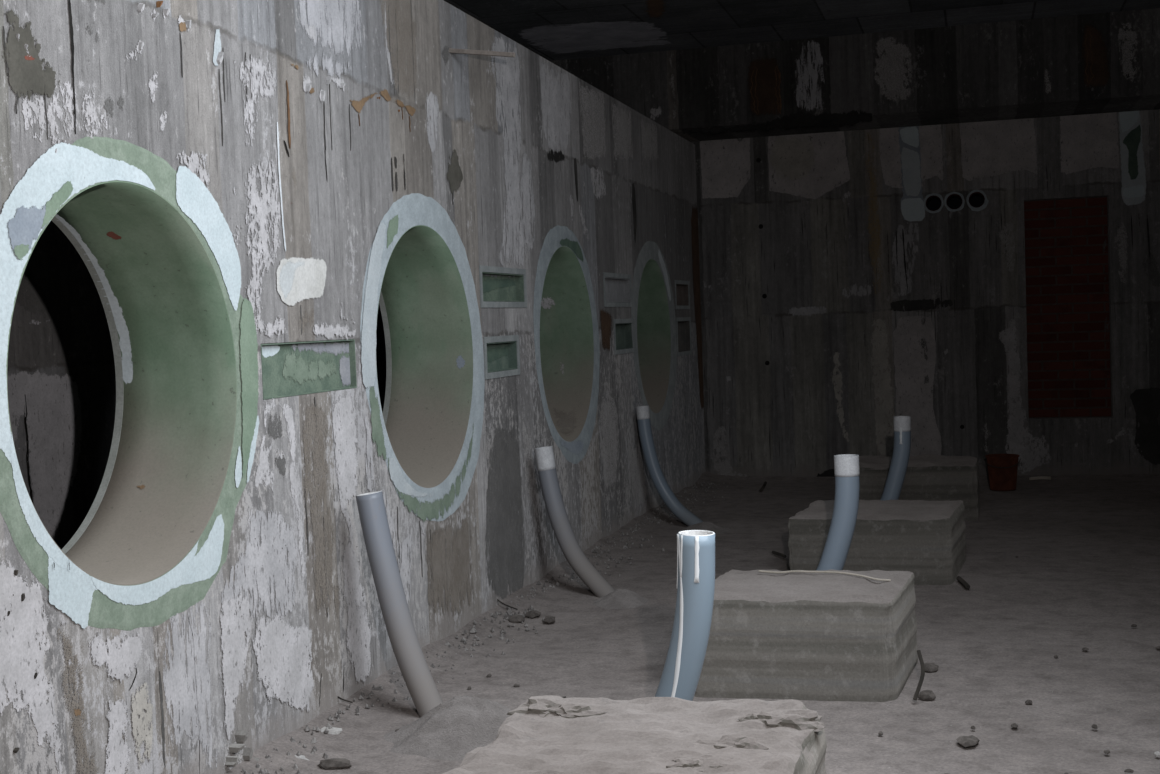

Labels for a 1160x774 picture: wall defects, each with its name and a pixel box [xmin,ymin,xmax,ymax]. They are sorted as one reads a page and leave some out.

leakage [3,10,60,140]
crack [68,0,76,134]
peeling [298,0,366,150]
corrosion [350,88,416,132]
peeling [384,2,395,85]
peeling [425,92,439,153]
peeling [794,40,824,111]
crack [24,396,33,503]